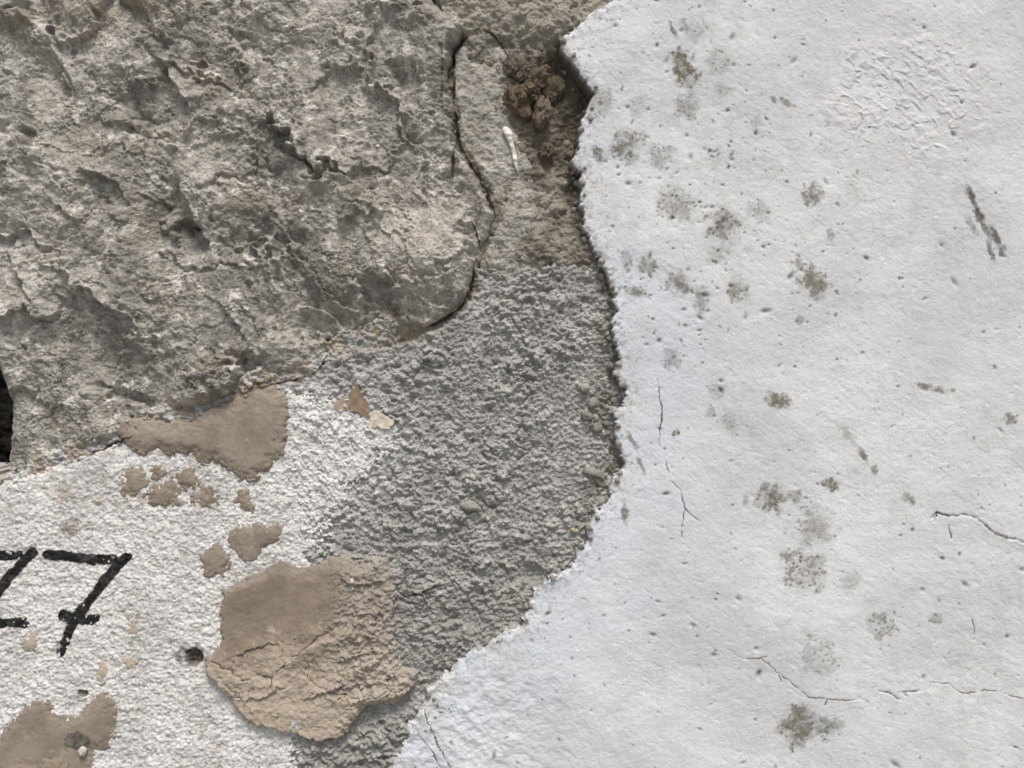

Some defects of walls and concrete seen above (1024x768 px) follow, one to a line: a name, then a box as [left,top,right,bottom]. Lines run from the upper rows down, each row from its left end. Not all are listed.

leakage [671,47,701,88]
crack [428,28,508,327]
leakage [707,208,741,237]
leakage [973,208,1005,259]
leakage [796,259,827,297]
spalling [0,0,626,768]
crack [657,380,700,535]
leakage [756,484,802,511]
crack [931,512,1024,543]
leakage [785,554,826,593]
crack [728,649,1023,705]
leakage [781,704,836,751]